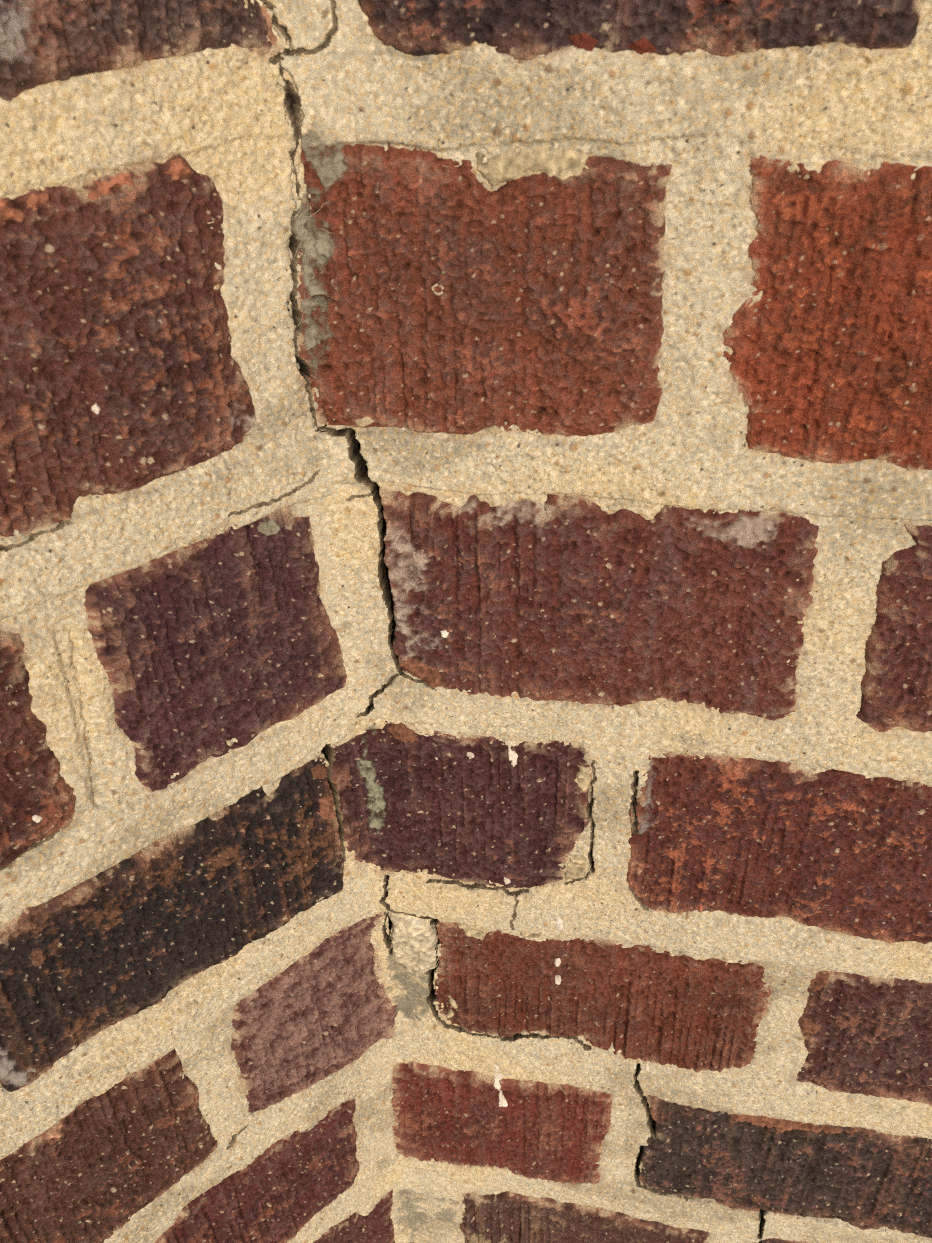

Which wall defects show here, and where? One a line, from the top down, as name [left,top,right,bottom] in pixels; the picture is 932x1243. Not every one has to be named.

crack [260,0,437,718]
crack [228,469,320,517]
crack [321,744,346,862]
peeling [387,913,441,1020]
peeling [446,995,457,1018]
crack [633,1063,692,1201]
crack [757,1209,767,1239]